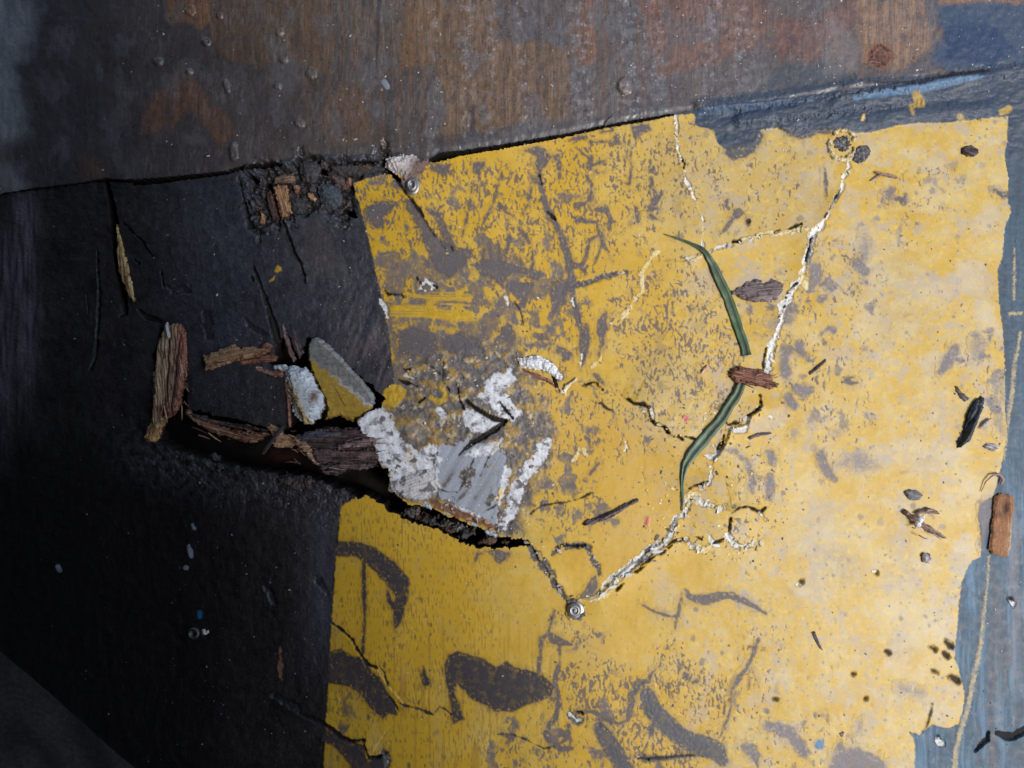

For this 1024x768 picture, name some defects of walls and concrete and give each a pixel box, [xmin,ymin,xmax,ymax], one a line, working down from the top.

crack [394,179,455,252]
crack [379,276,438,319]
peeling [357,402,448,503]
crack [397,361,514,457]
peeling [458,364,523,490]
peeling [468,436,554,568]
crack [524,114,852,603]
peeling [904,489,923,501]
peeling [935,330,1009,408]
peeling [975,496,993,557]
crack [330,622,452,716]
crack [299,713,392,768]